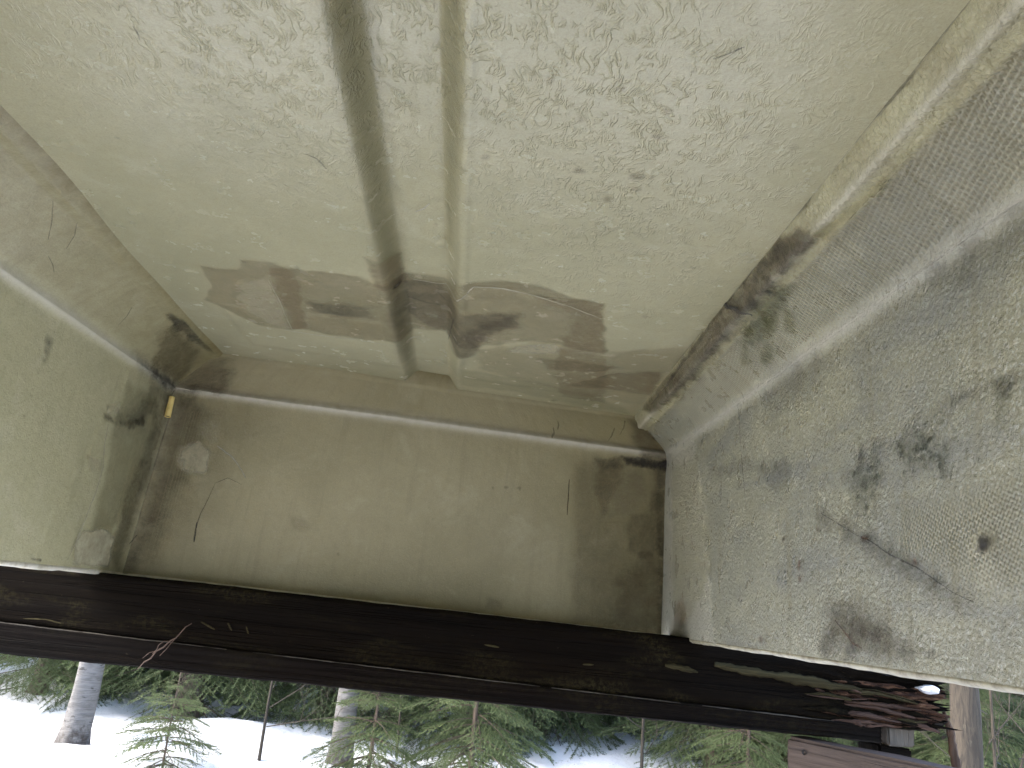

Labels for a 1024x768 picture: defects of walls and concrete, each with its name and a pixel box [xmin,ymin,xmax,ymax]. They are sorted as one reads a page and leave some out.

leakage [645,231,812,410]
leakage [624,448,667,470]